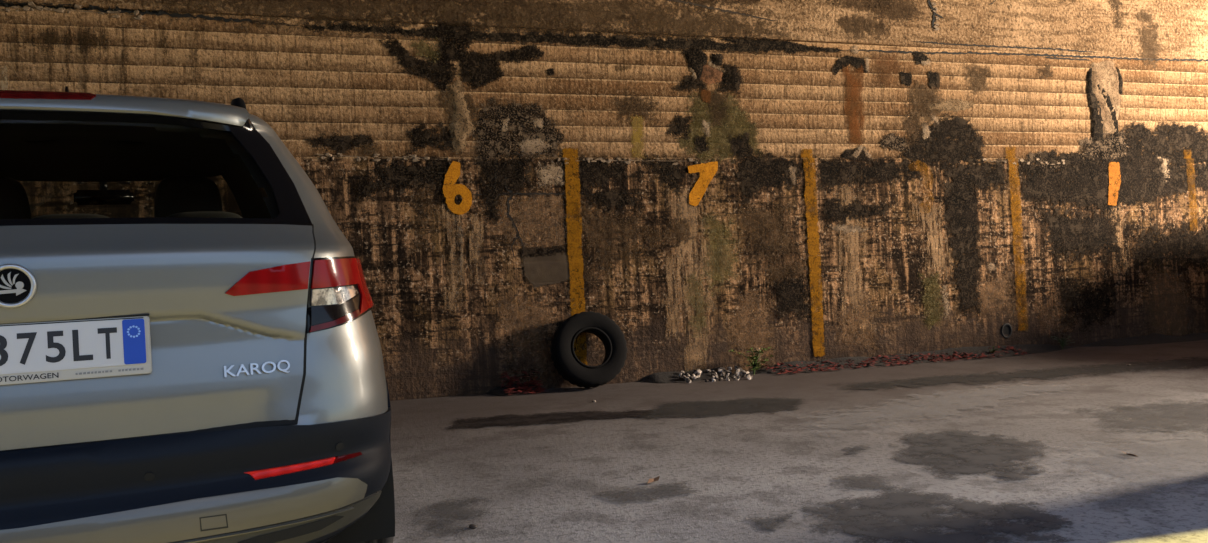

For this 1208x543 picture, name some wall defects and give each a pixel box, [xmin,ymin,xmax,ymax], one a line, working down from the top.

damp [0,23,128,96]
crack [0,0,1208,62]
damp [808,0,924,41]
damp [142,0,792,315]
damp [731,112,1208,352]